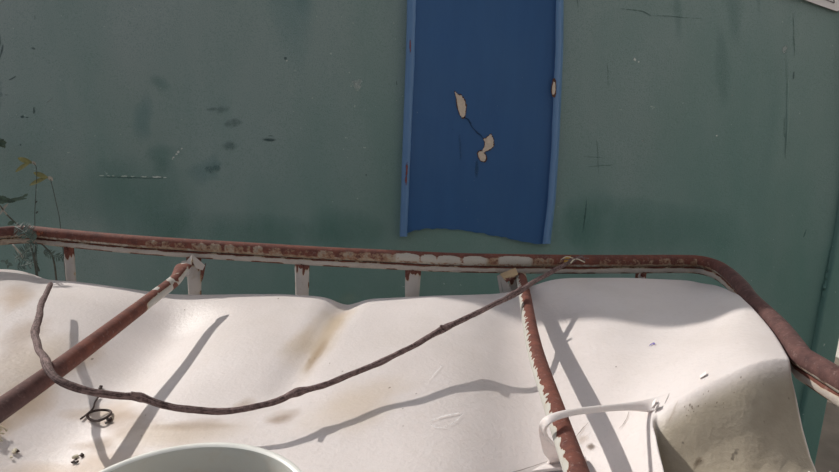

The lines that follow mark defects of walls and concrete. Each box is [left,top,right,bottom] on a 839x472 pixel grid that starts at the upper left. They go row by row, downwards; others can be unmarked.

peeling [455,91,467,119]
peeling [477,133,495,162]